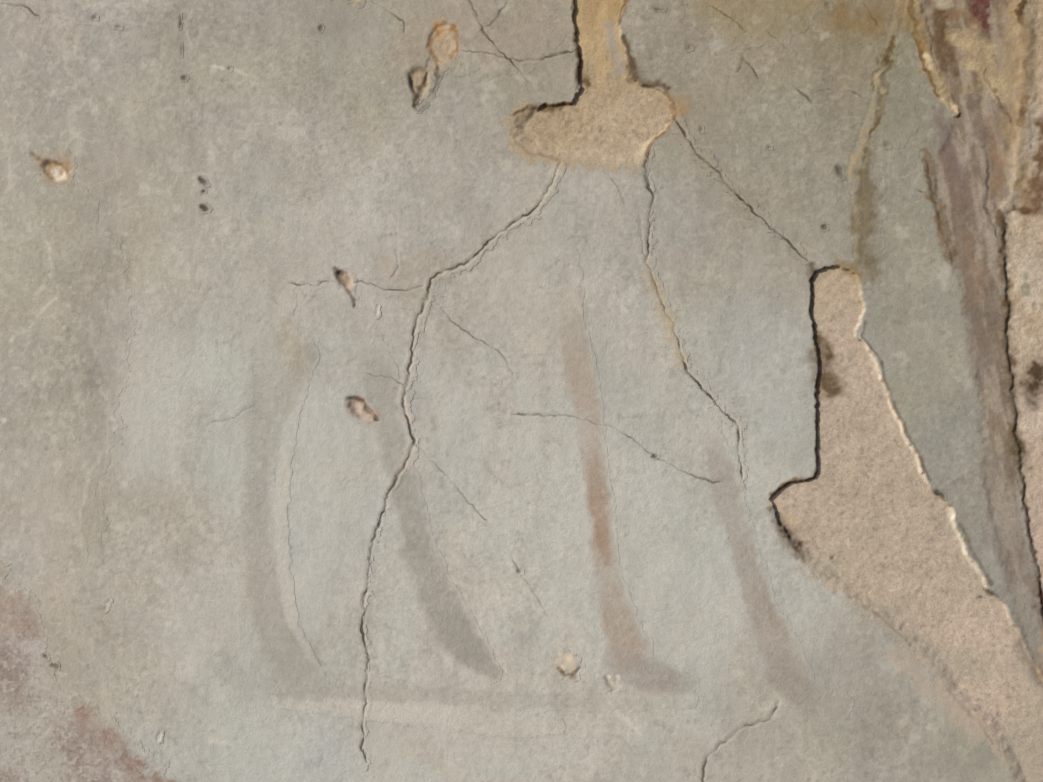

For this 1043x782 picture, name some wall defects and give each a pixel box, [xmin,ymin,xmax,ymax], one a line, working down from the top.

peeling [28,151,74,188]
peeling [406,14,463,113]
flaking render [498,0,704,177]
peeling [330,266,359,309]
crack [639,110,809,491]
peeling [343,391,385,431]
crack [355,152,567,771]
flaking render [762,0,1043,782]